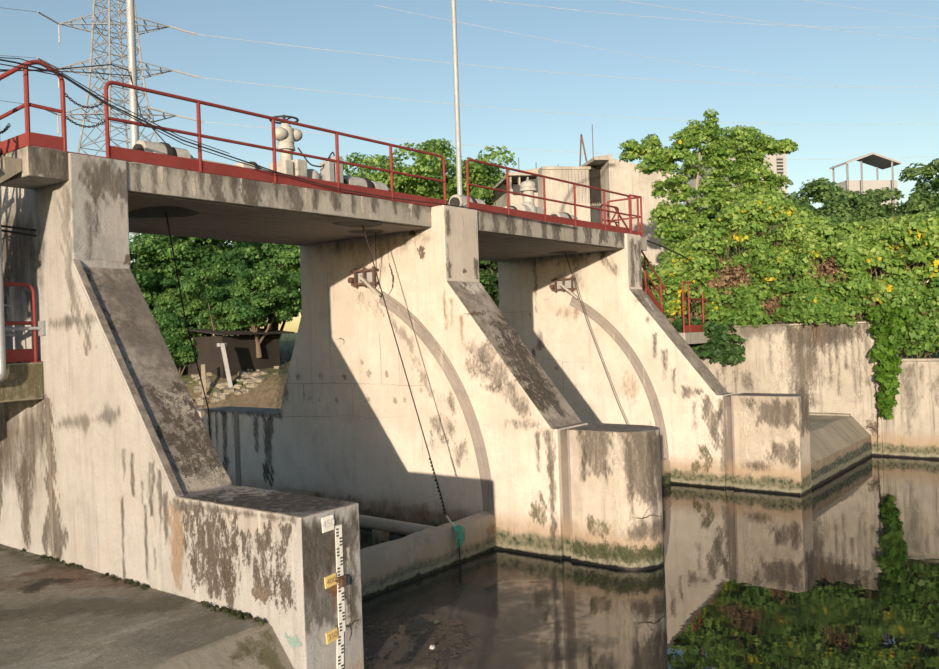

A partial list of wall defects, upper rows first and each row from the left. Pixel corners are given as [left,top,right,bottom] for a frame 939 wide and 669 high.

water stain [184,170,262,205]
water stain [274,184,317,211]
water stain [331,192,377,218]
water stain [471,310,569,426]
water stain [740,324,875,470]
water stain [0,397,68,561]
water stain [130,340,381,632]
water stain [536,431,557,547]
water stain [579,430,664,540]
water stain [17,578,87,593]
water stain [0,595,190,620]